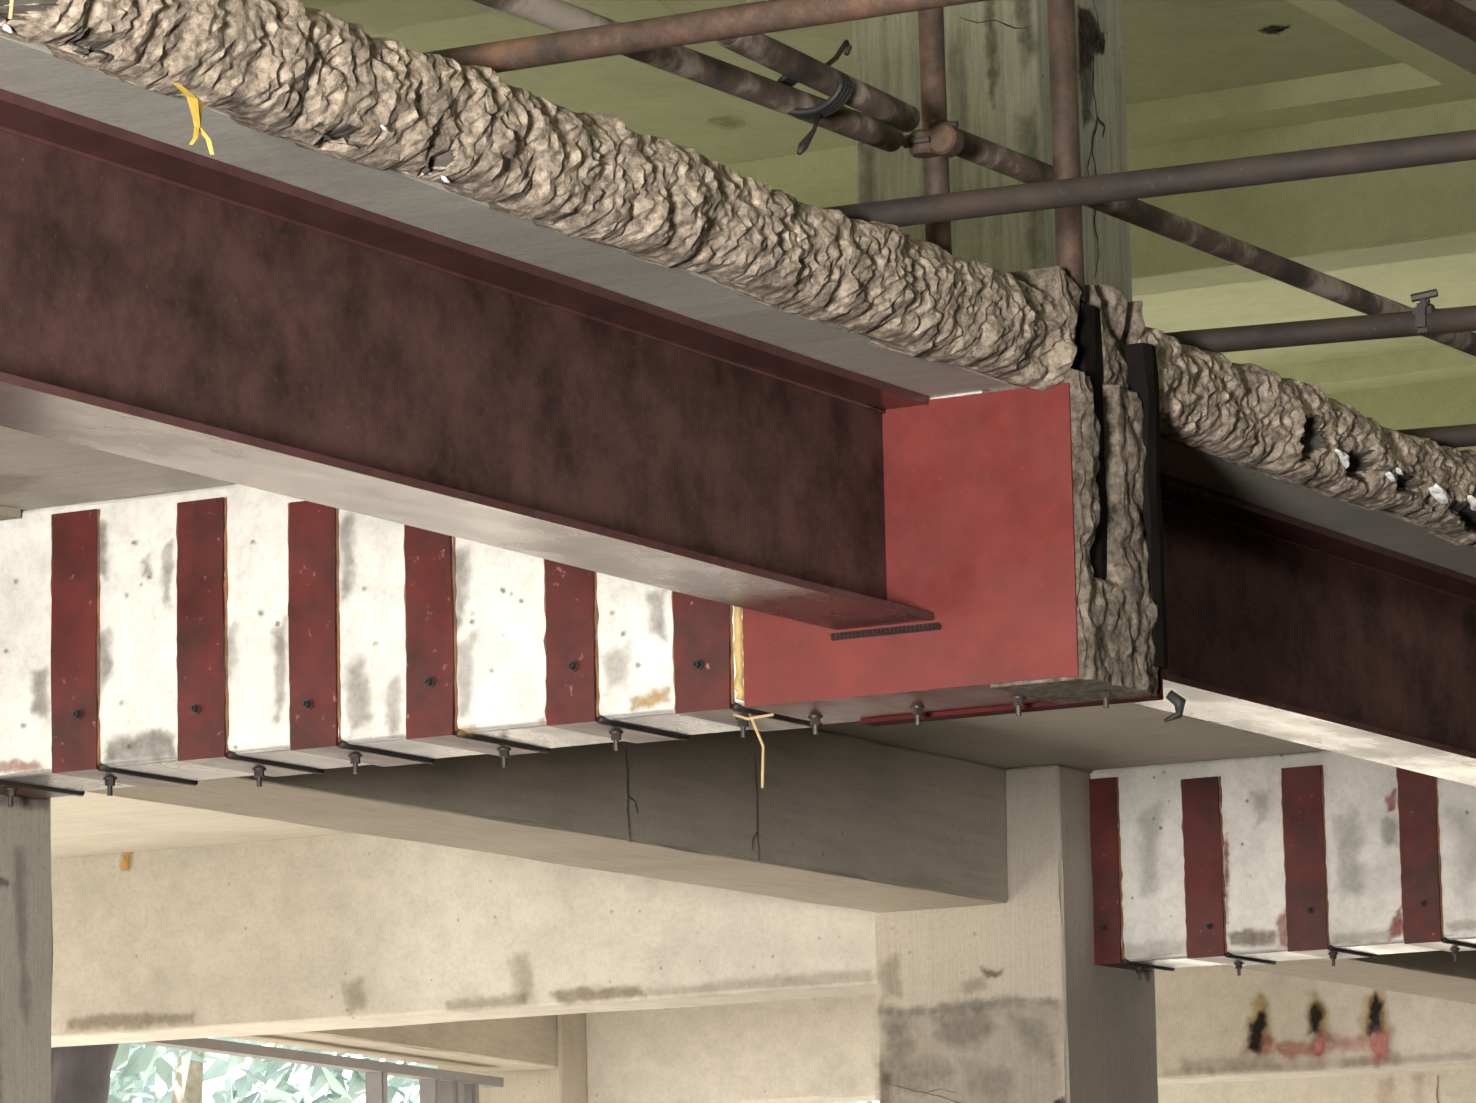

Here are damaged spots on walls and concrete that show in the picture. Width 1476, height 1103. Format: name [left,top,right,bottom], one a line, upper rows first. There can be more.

spalling [1137,326,1476,547]
crack [626,747,638,837]
crack [751,753,759,858]